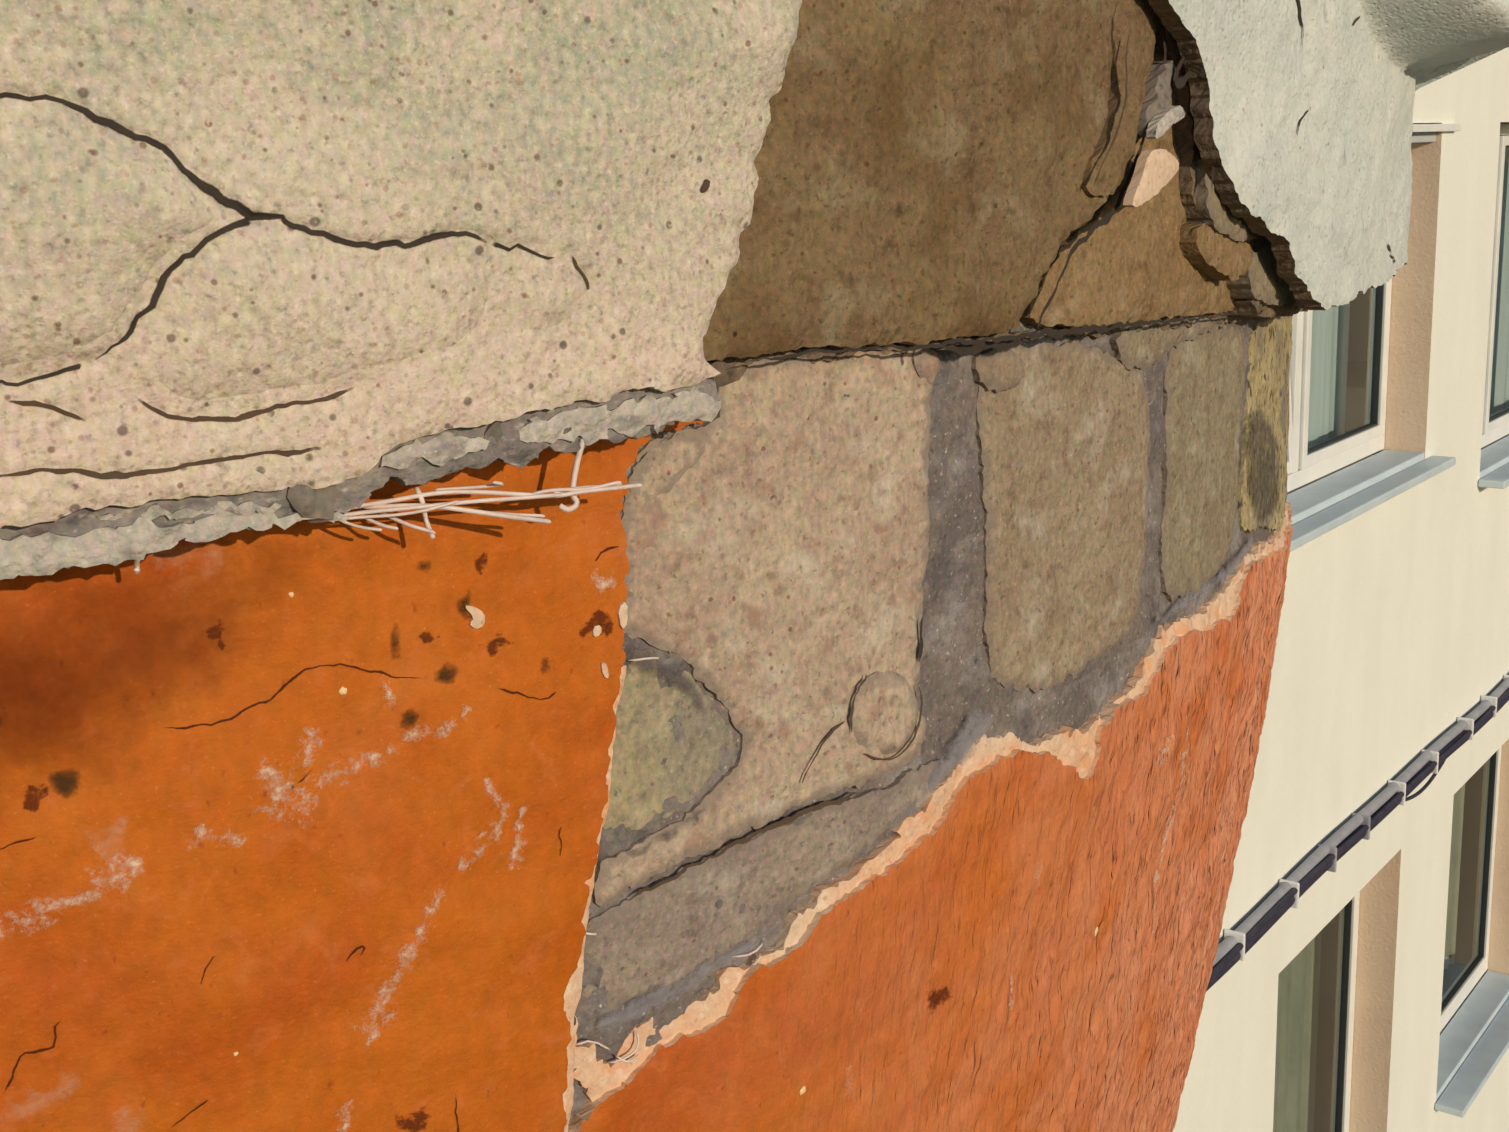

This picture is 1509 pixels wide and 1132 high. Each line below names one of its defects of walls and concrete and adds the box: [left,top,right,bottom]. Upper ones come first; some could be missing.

crack [1296,0,1304,41]
crack [0,92,589,421]
flaking render [0,378,721,580]
flaking render [563,0,1308,1132]
peeling [465,605,485,629]
crack [170,663,416,729]
water stain [355,731,417,769]
water stain [260,767,327,814]
water stain [459,779,525,869]
efflorescence [14,856,142,924]
water stain [367,899,439,1045]